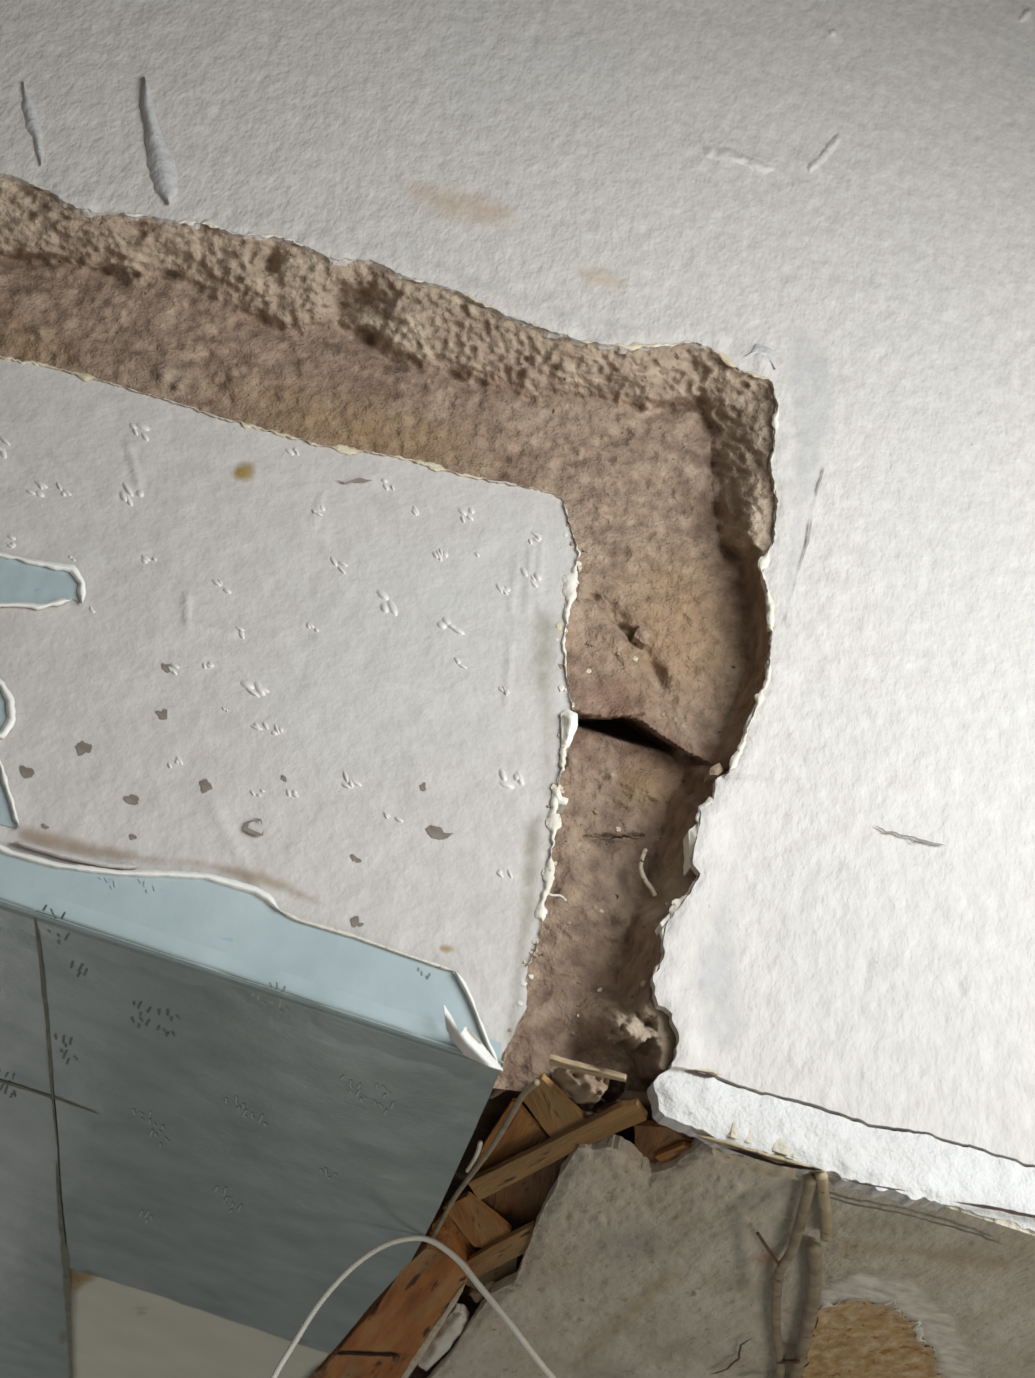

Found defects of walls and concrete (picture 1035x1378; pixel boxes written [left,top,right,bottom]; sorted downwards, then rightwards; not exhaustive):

spalling [0,173,779,1103]
crack [578,719,661,748]
crack [685,1069,1031,1167]